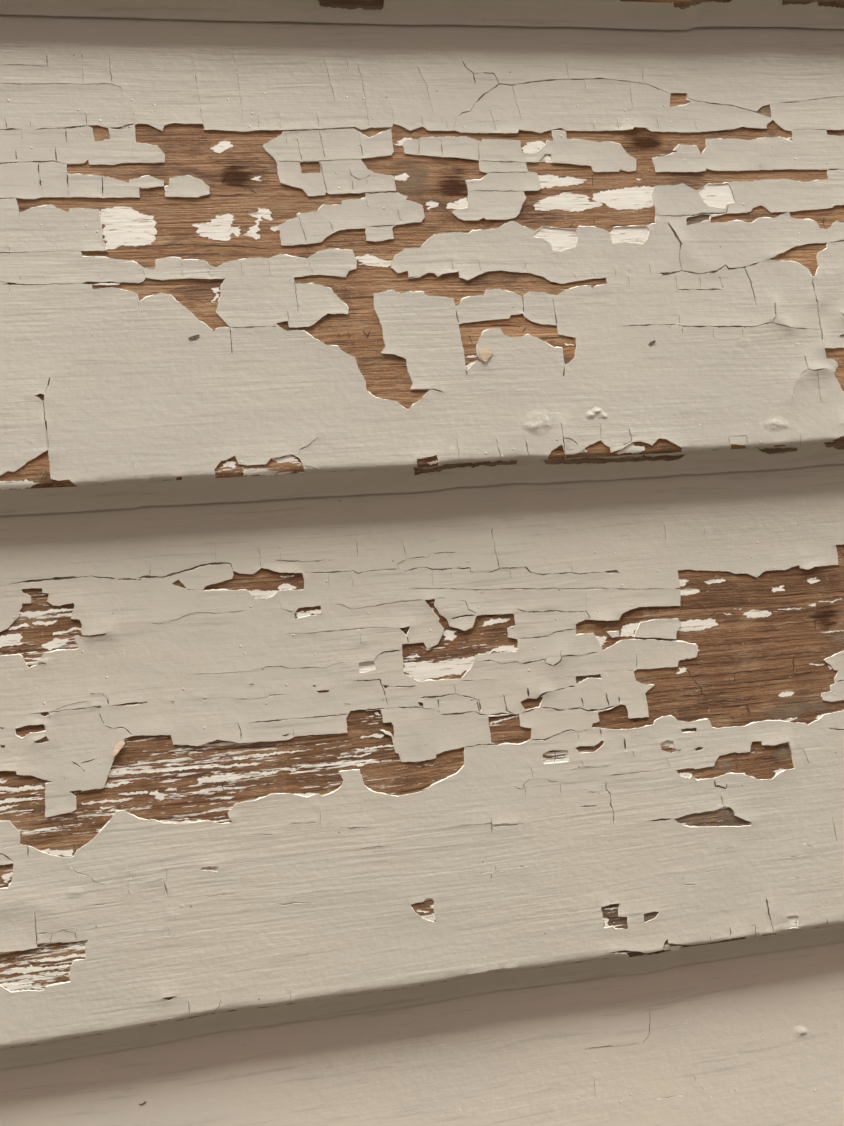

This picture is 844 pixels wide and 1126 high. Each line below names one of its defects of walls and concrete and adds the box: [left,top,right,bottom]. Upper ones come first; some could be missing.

crack [234,61,401,227]
crack [417,64,660,192]
crack [694,97,836,130]
peeling [16,105,844,410]
peeling [0,588,106,668]
crack [33,693,132,735]
crack [0,546,233,586]
peeling [0,710,464,857]
crack [187,542,669,824]
peeling [400,599,518,681]
peeling [543,544,844,764]
peeling [676,741,794,780]